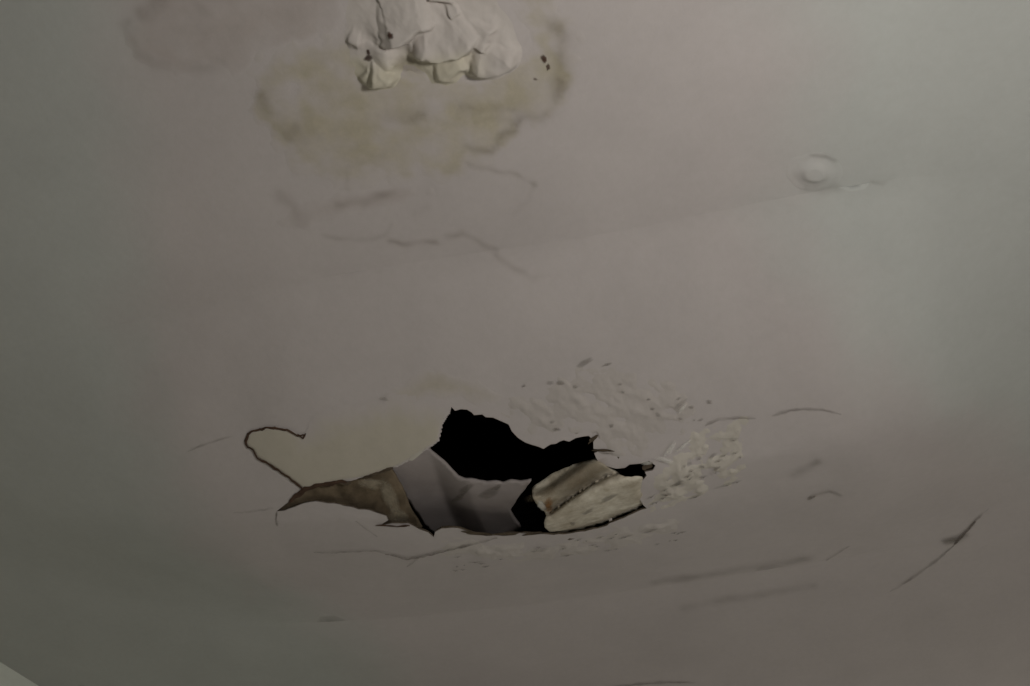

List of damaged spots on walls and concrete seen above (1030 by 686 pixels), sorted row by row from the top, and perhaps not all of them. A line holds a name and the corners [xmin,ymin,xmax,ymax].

damp [123,0,586,231]
crack [244,427,306,517]
spalling [247,393,655,540]